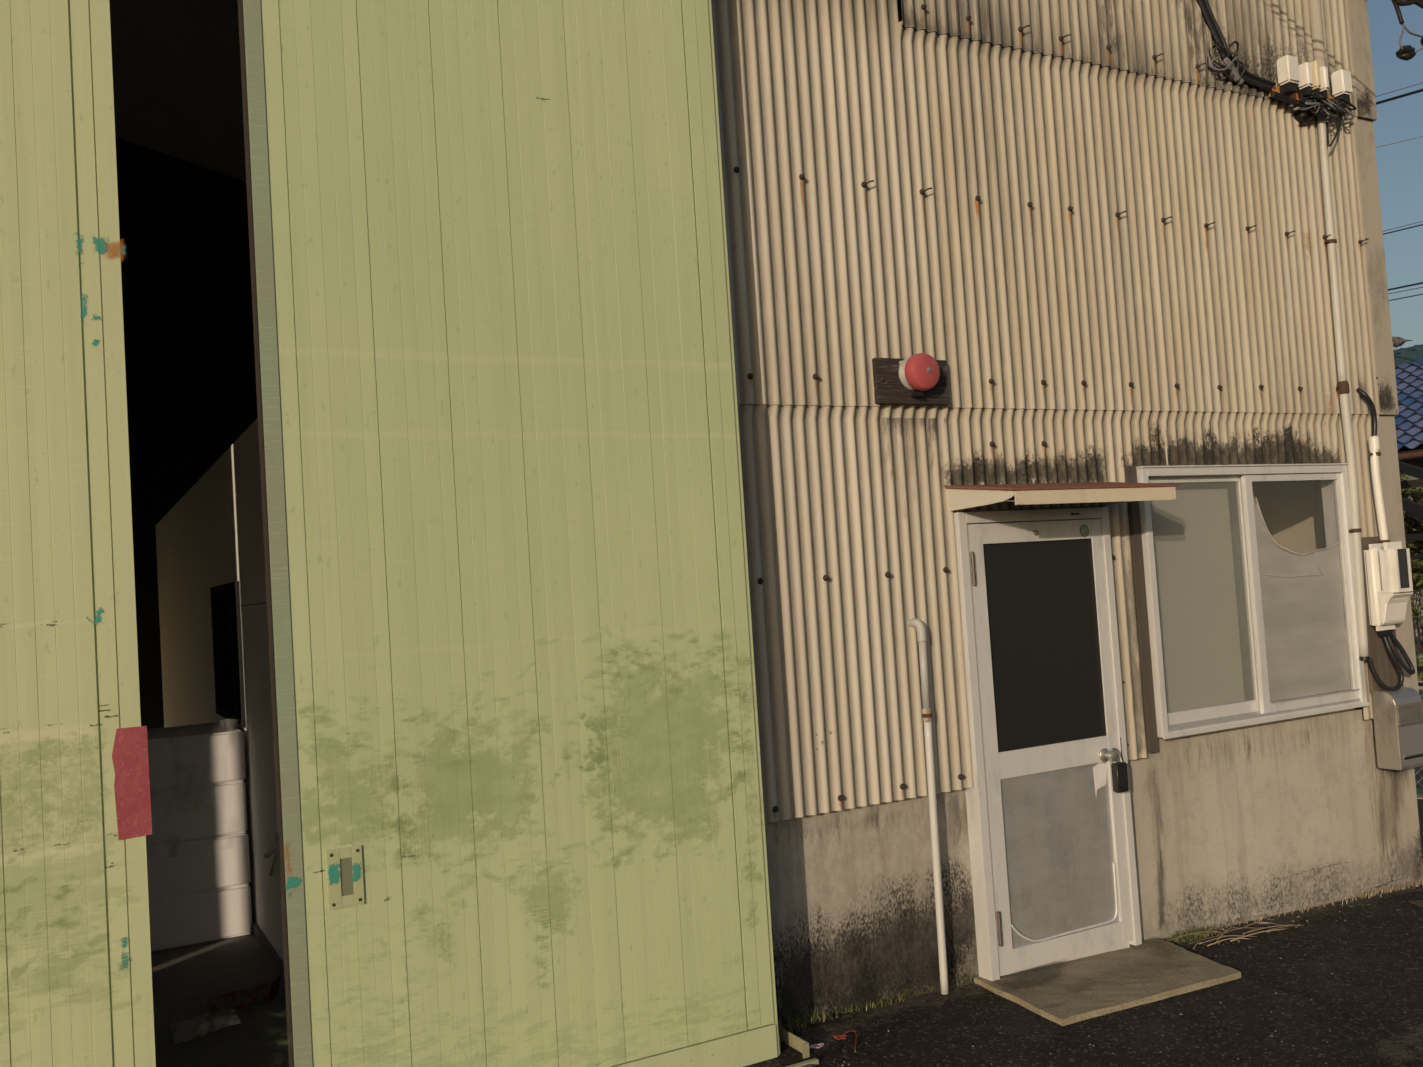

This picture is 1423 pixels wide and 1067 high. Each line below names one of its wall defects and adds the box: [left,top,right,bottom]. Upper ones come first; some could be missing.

leakage [942,426,1340,485]
leakage [773,865,979,1026]